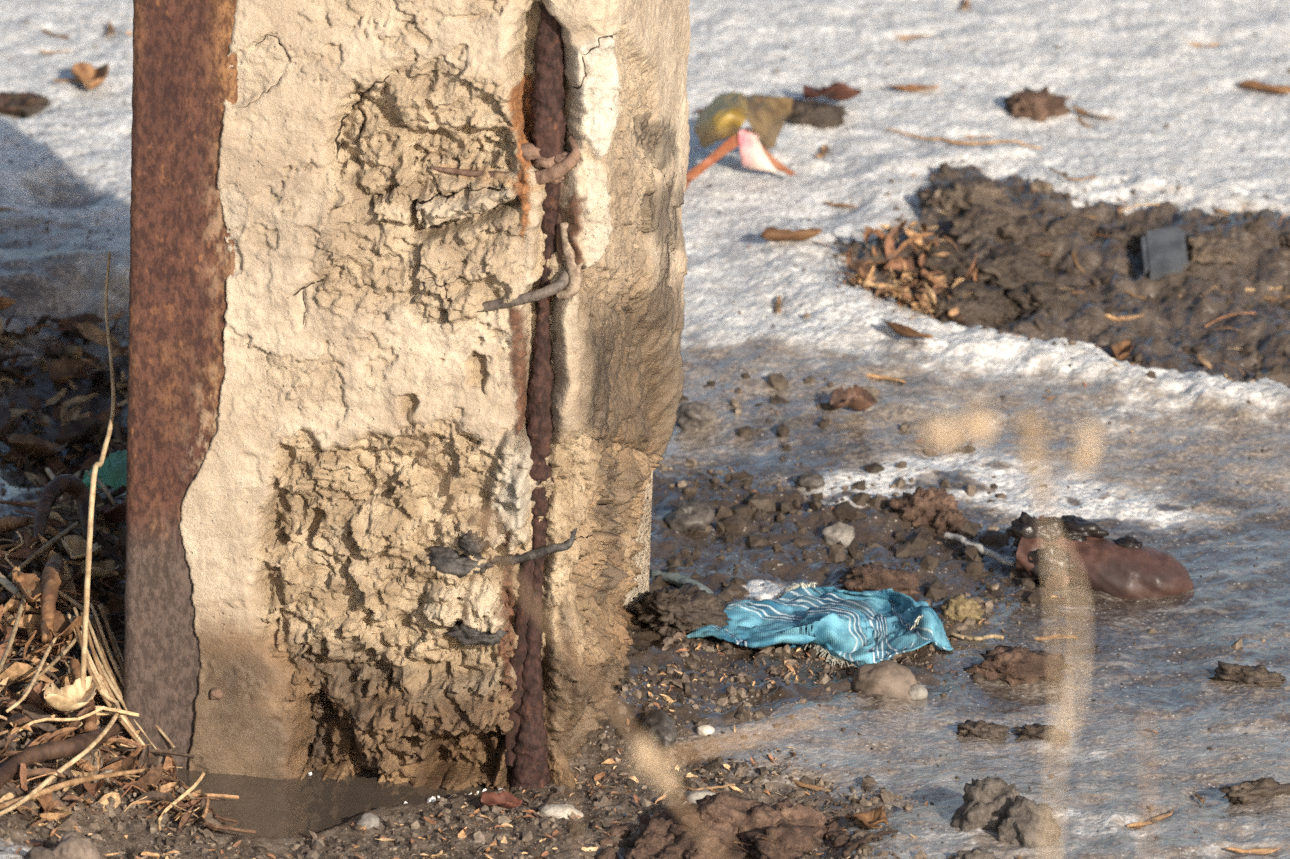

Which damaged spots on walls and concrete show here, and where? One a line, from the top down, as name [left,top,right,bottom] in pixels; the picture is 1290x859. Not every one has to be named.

crack [573,33,617,89]
corrosion [509,74,534,237]
corrosion [562,192,583,266]
spalling [254,0,669,792]
corrosion [509,308,529,435]
corrosion [497,530,515,694]